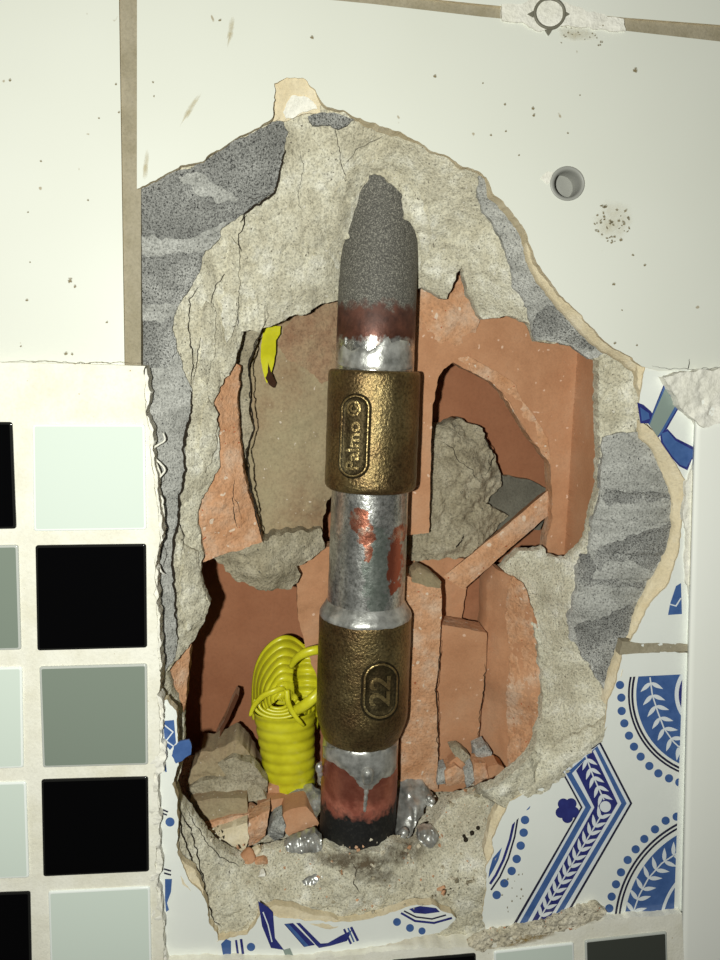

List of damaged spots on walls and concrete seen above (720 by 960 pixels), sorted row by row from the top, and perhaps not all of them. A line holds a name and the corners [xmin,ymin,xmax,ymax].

spalling [141,78,694,956]